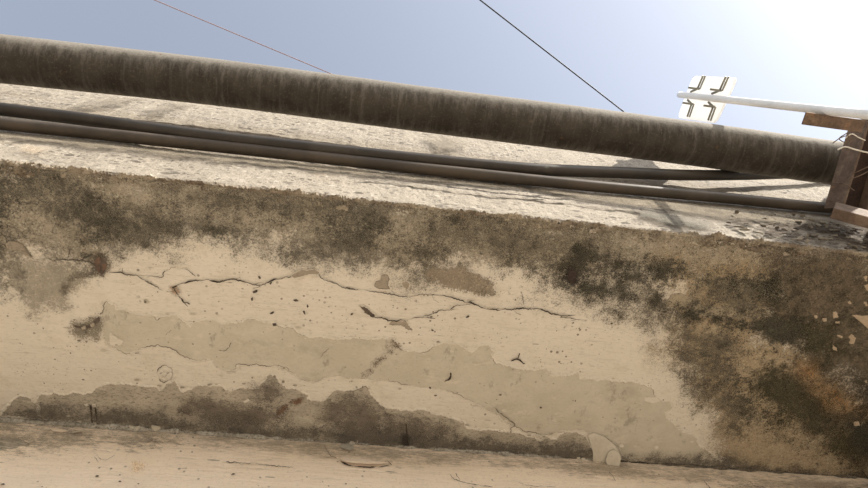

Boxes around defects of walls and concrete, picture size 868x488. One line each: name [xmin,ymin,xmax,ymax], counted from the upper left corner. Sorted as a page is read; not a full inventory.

leakage [0,132,507,187]
spalling [0,159,868,260]
flaking render [94,257,107,275]
crack [113,267,291,307]
peeling [290,267,320,279]
peeling [373,273,391,290]
leakage [0,165,868,478]
peeling [424,265,496,297]
crack [318,274,645,324]
peeling [666,293,772,320]
spalling [852,302,868,328]
peeling [0,299,726,468]